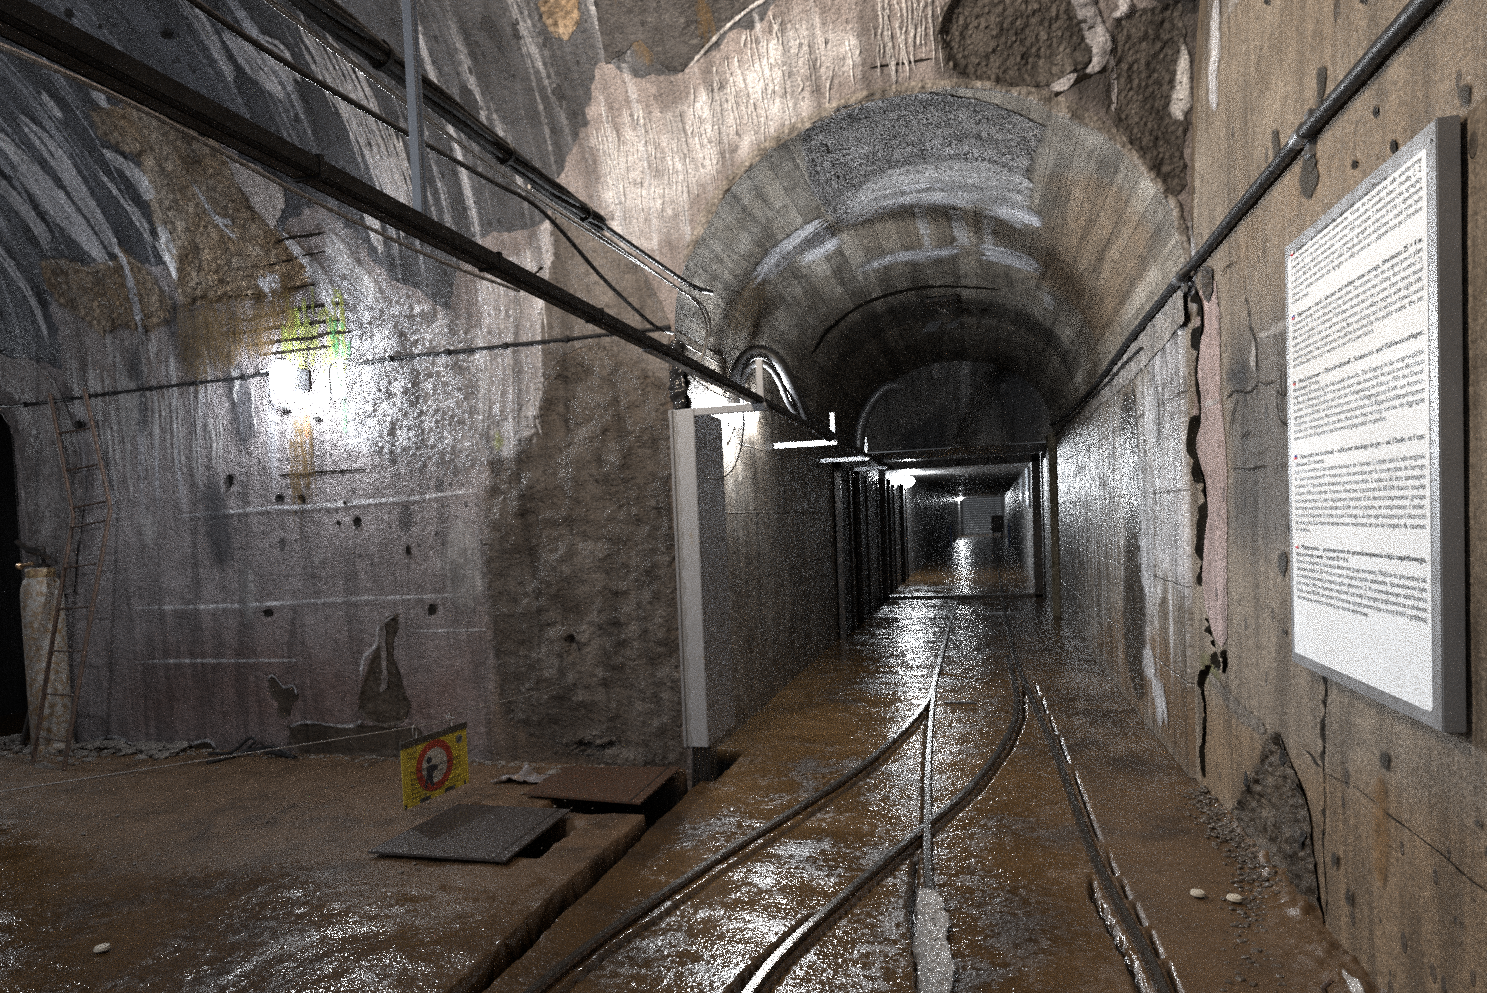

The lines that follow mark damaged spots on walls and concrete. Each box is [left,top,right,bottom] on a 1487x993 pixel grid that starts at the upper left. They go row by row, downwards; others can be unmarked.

spalling [39,99,315,338]
crack [1186,262,1288,778]
peeling [268,613,423,758]
spalling [1230,731,1336,926]
crack [1305,676,1487,916]